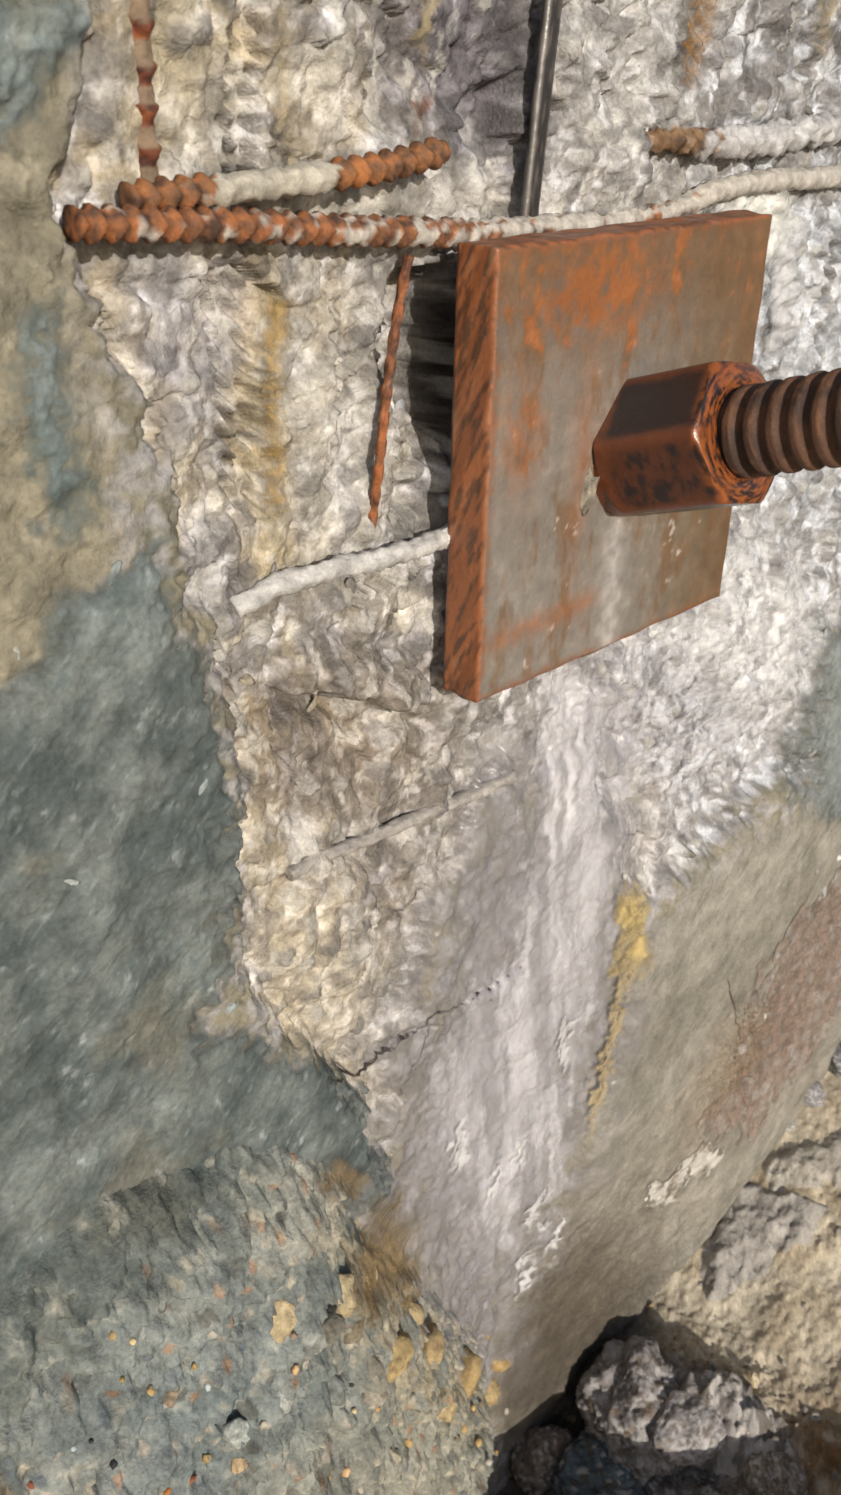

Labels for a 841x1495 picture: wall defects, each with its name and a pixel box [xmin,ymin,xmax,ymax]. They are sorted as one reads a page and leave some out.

spalling [0,0,841,1075]
peeling [0,539,397,1296]
spalling [644,855,841,1210]